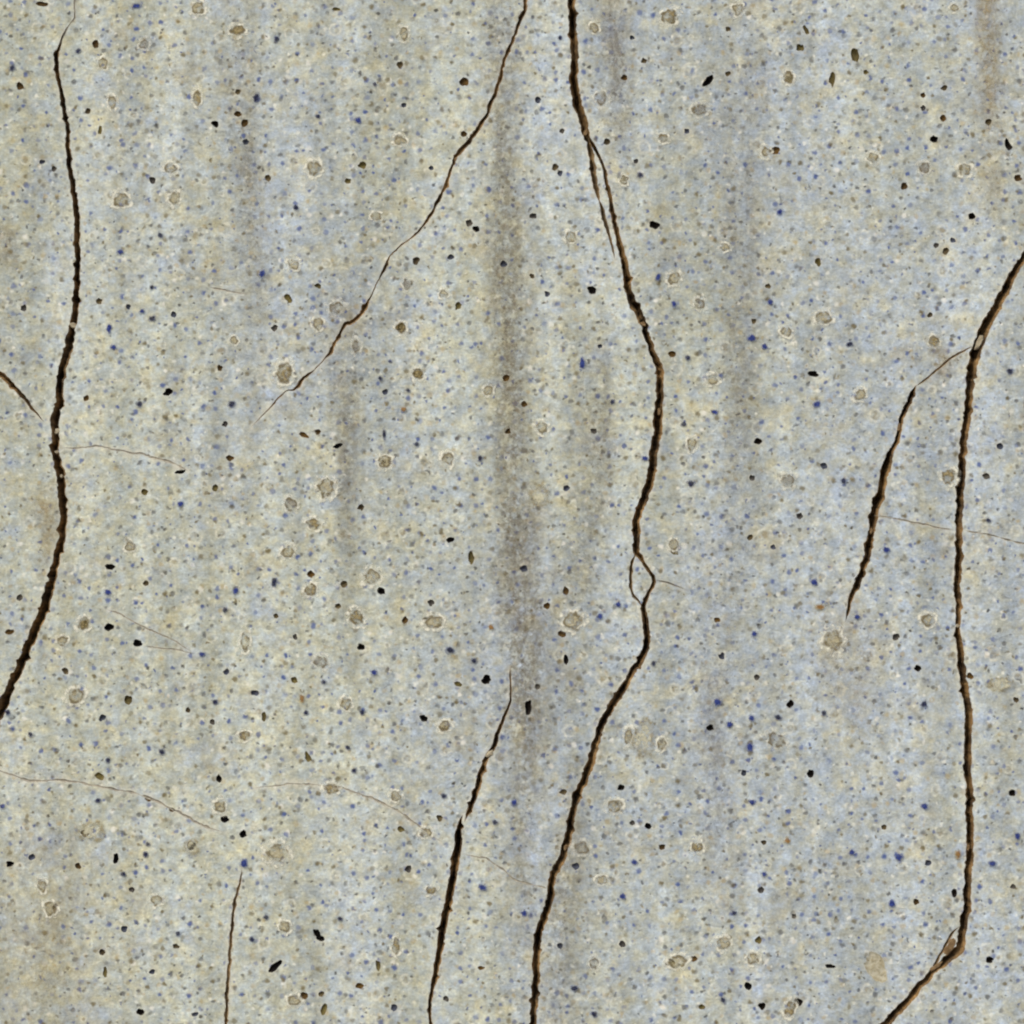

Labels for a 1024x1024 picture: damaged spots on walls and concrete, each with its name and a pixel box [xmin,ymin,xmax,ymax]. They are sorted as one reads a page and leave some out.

crack [0,0,194,720]
crack [224,870,242,1024]
crack [252,0,683,1024]
crack [845,251,1024,1024]